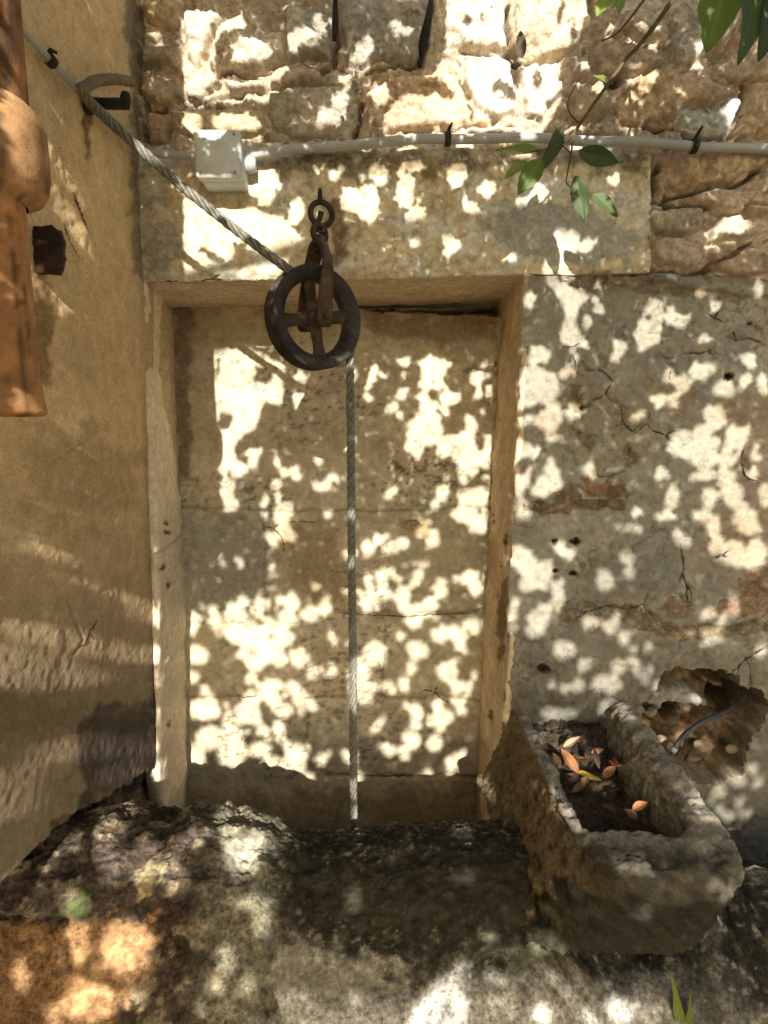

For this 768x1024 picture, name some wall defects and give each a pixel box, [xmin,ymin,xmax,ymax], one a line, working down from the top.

crack [565,343,676,441]
crack [558,595,678,631]
spalling [641,665,768,786]